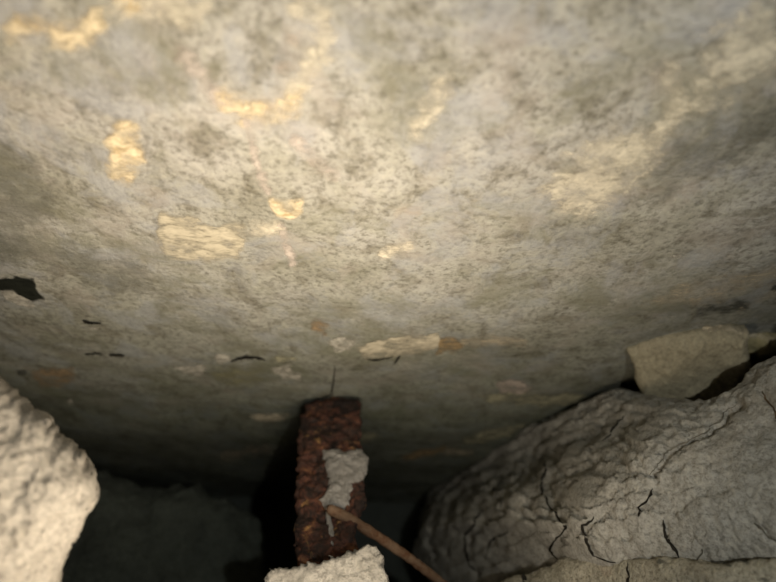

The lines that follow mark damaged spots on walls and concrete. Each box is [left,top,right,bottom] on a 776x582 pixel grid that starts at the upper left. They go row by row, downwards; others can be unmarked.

spalling [0,277,43,307]
crack [637,404,737,517]
crack [662,520,703,560]
crack [754,523,776,541]